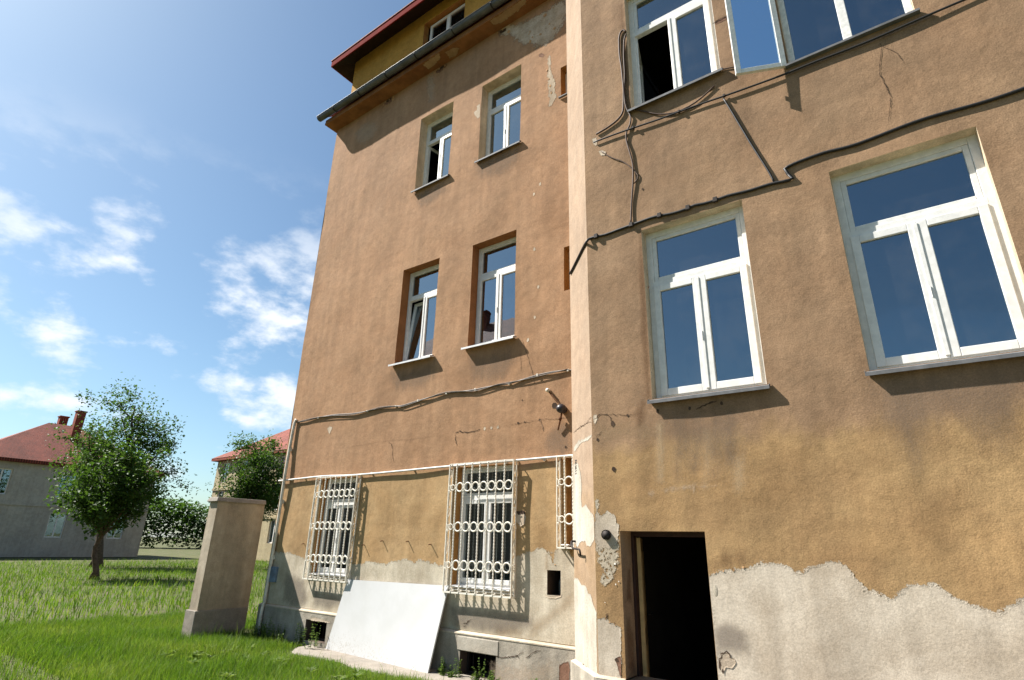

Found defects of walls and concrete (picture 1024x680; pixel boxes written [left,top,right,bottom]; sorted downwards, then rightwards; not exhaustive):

flaking render [490,0,566,106]
crack [879,44,903,121]
crack [505,414,632,437]
flaking render [263,435,622,680]
flaking render [709,560,1024,680]